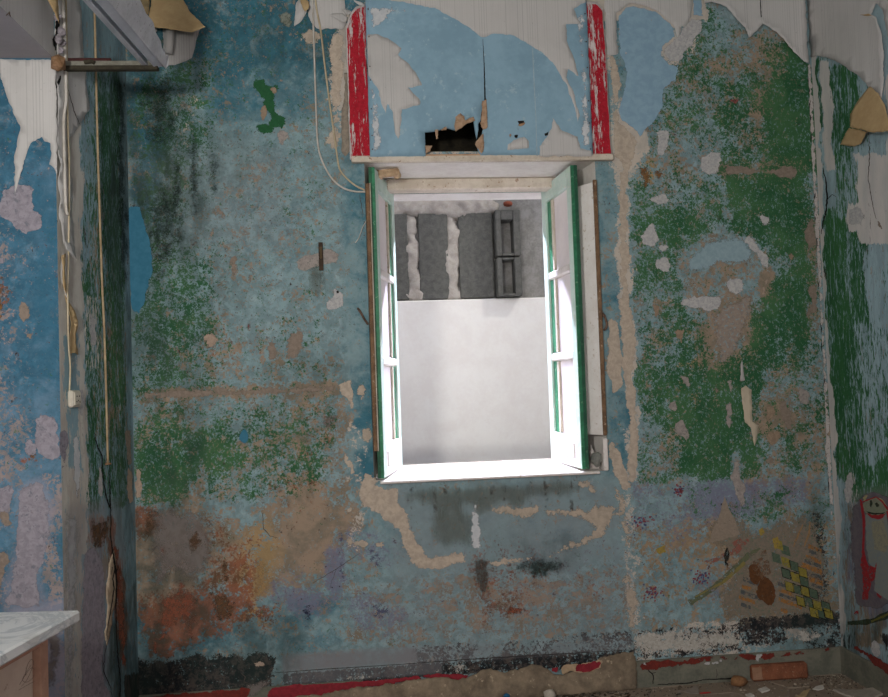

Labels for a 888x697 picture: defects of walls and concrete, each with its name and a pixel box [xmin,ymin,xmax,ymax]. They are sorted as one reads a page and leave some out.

leakage [150,135,199,276]
crack [95,437,121,697]
leakage [476,560,487,591]
leakage [518,560,561,578]
peeling [267,664,469,697]
peeling [552,660,601,674]